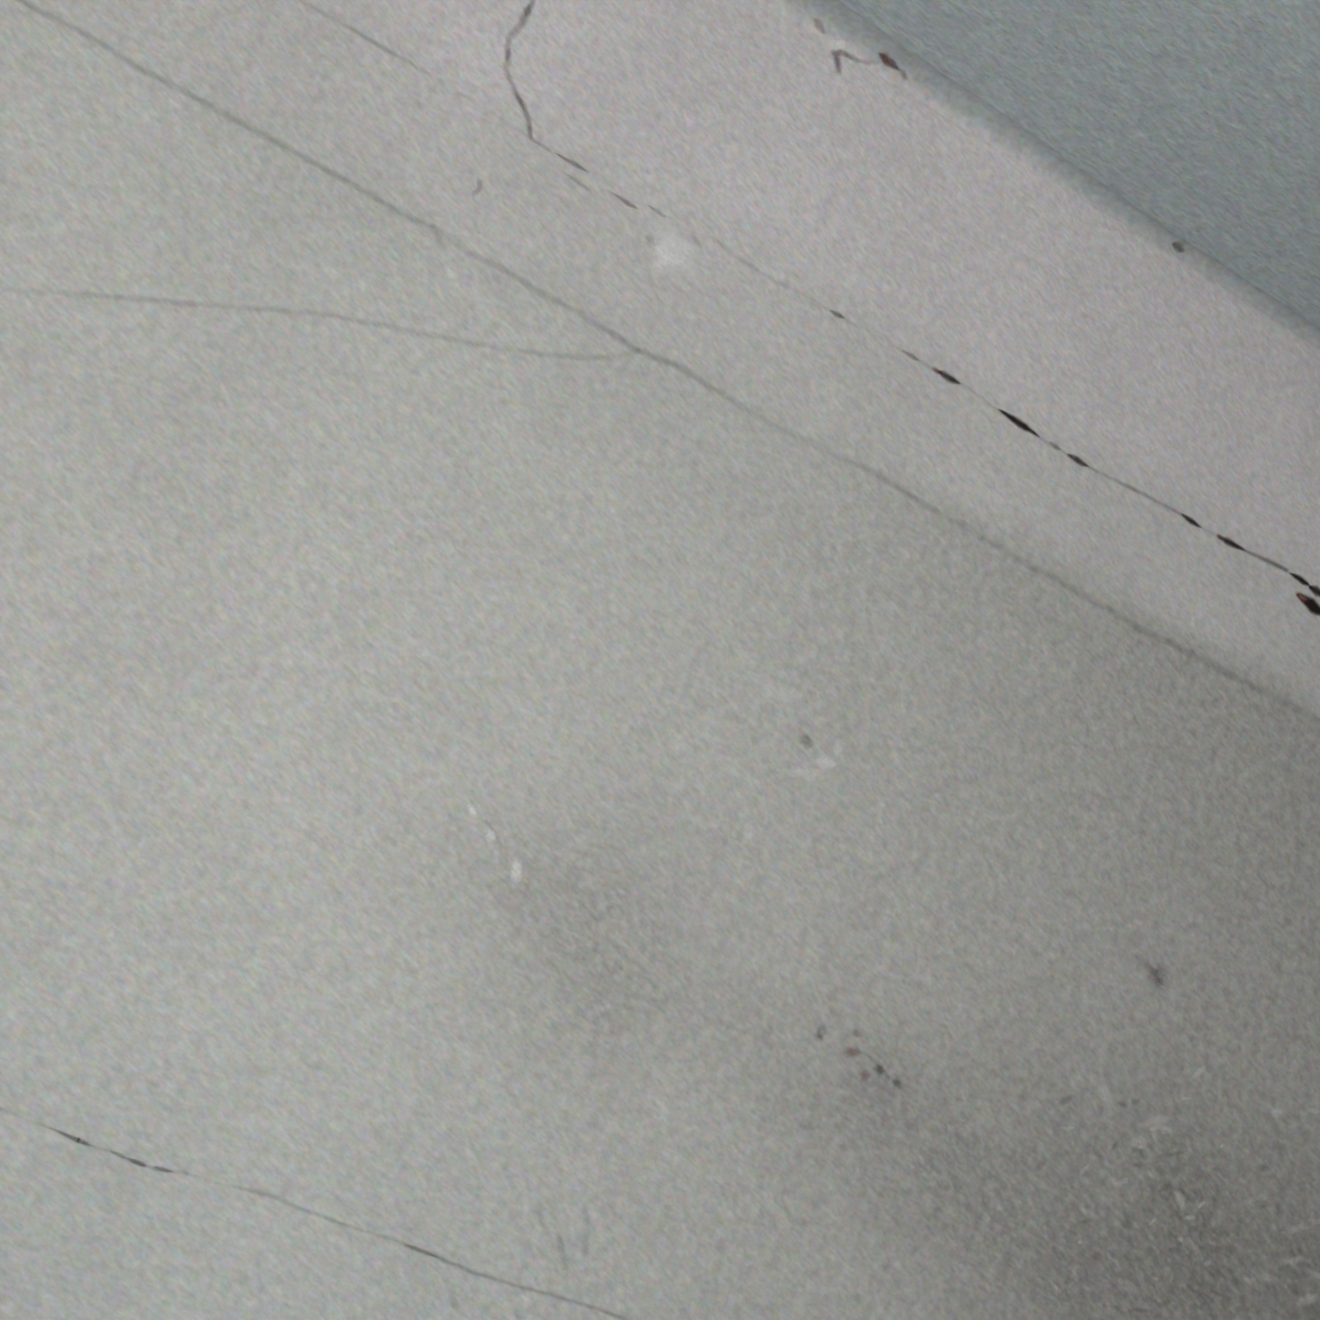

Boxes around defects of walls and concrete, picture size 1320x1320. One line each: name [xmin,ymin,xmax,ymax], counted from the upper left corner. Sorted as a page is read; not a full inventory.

crack [934,368,959,384]
crack [1000,410,1038,436]
crack [1069,455,1088,466]
crack [1182,514,1244,550]
crack [1274,564,1320,615]